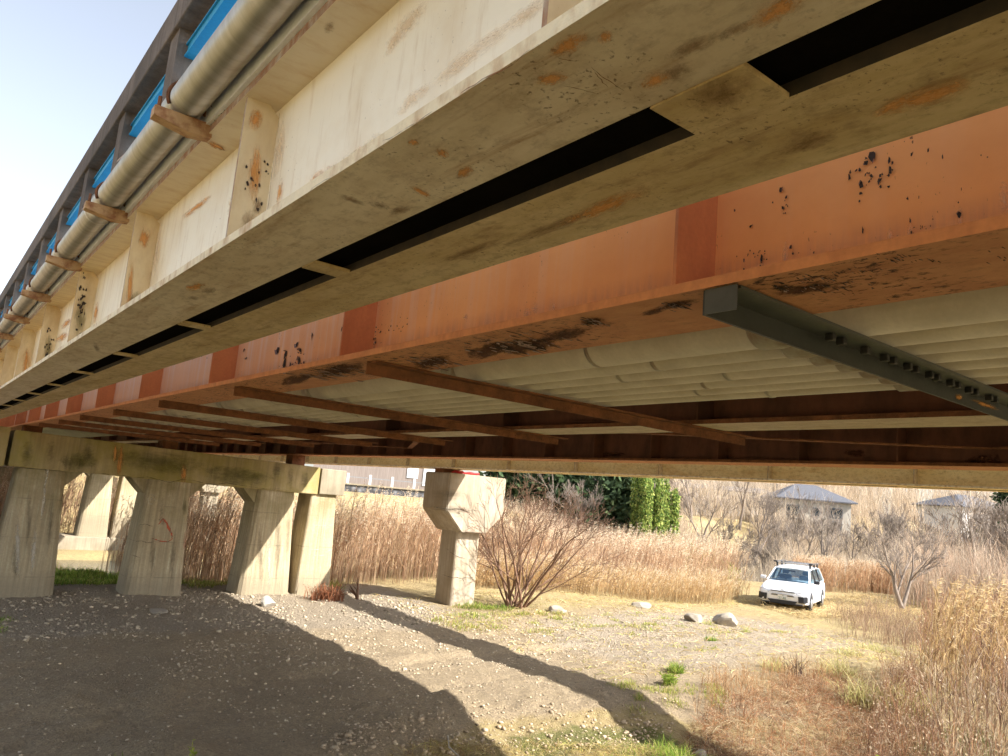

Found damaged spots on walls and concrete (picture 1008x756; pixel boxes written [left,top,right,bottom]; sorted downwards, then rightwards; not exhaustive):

corrosion [771,253,941,295]
corrosion [644,301,694,315]
corrosion [407,317,610,371]